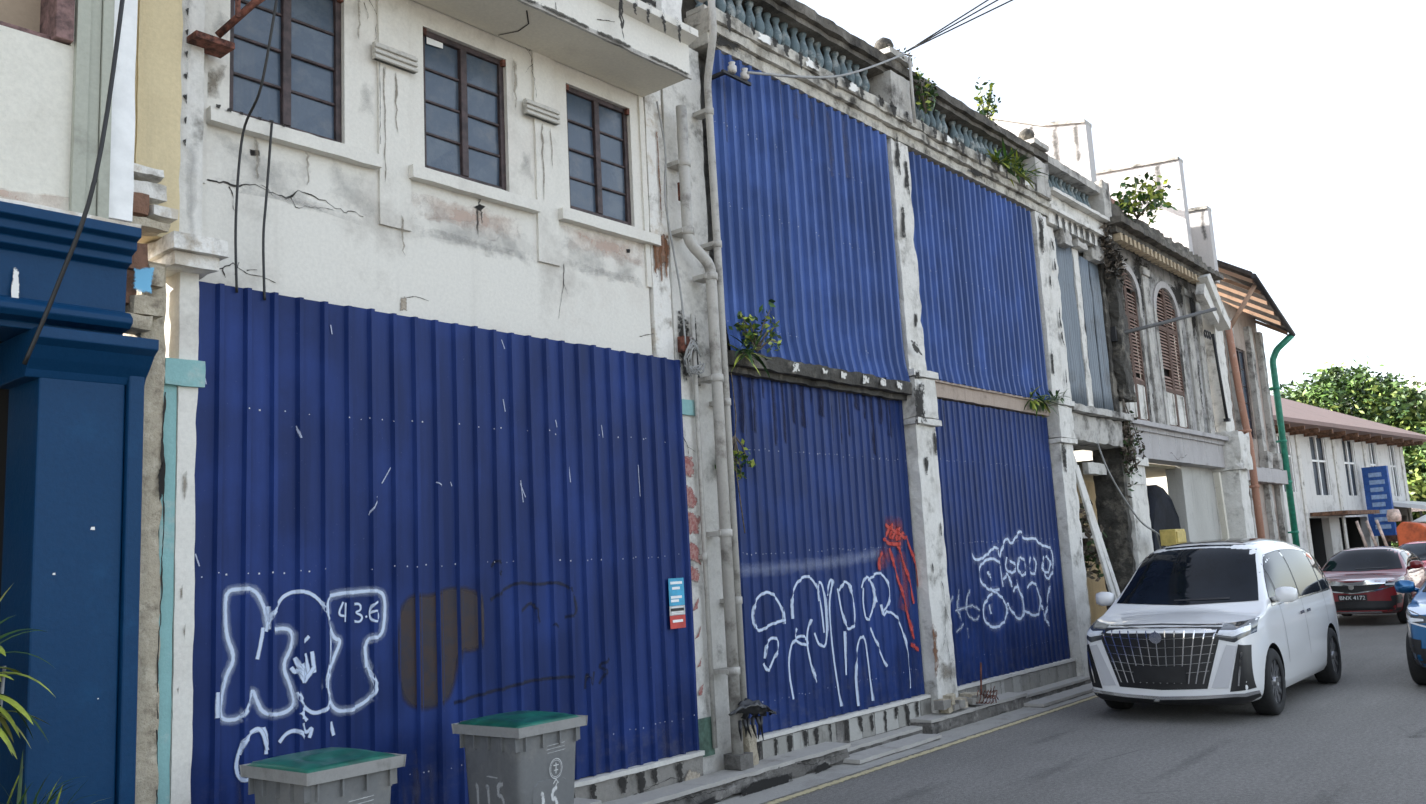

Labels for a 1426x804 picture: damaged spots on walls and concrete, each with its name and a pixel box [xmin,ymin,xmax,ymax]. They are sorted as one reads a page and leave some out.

crack [207,179,364,217]